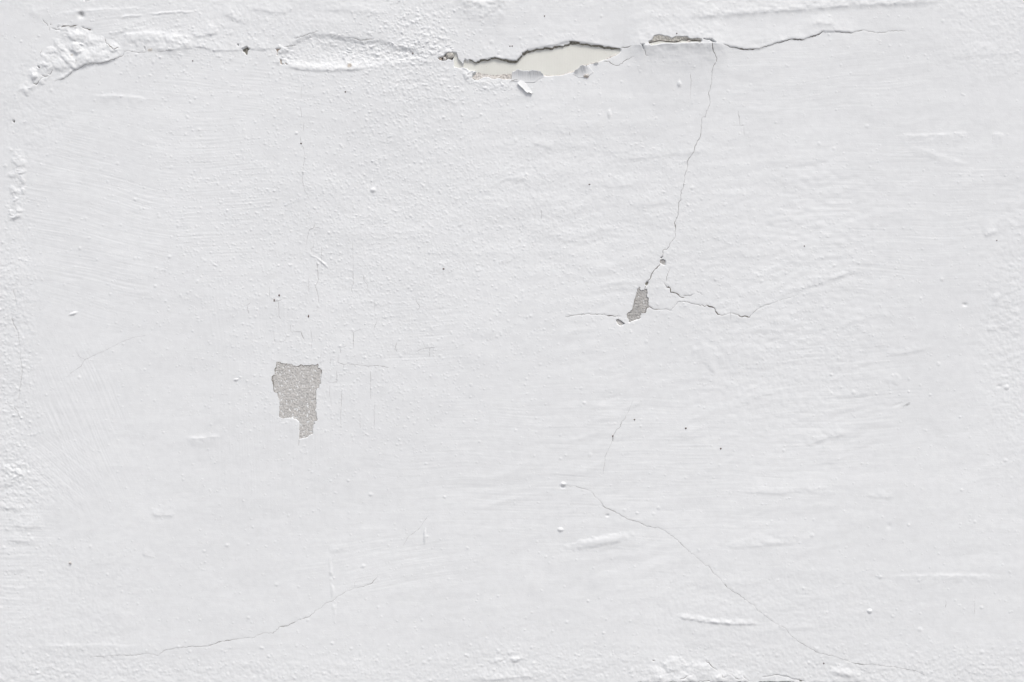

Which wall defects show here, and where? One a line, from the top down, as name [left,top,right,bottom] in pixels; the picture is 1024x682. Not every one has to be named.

spalling [470,41,619,63]
crack [645,30,897,320]
peeling [616,282,650,325]
peeling [272,362,322,439]